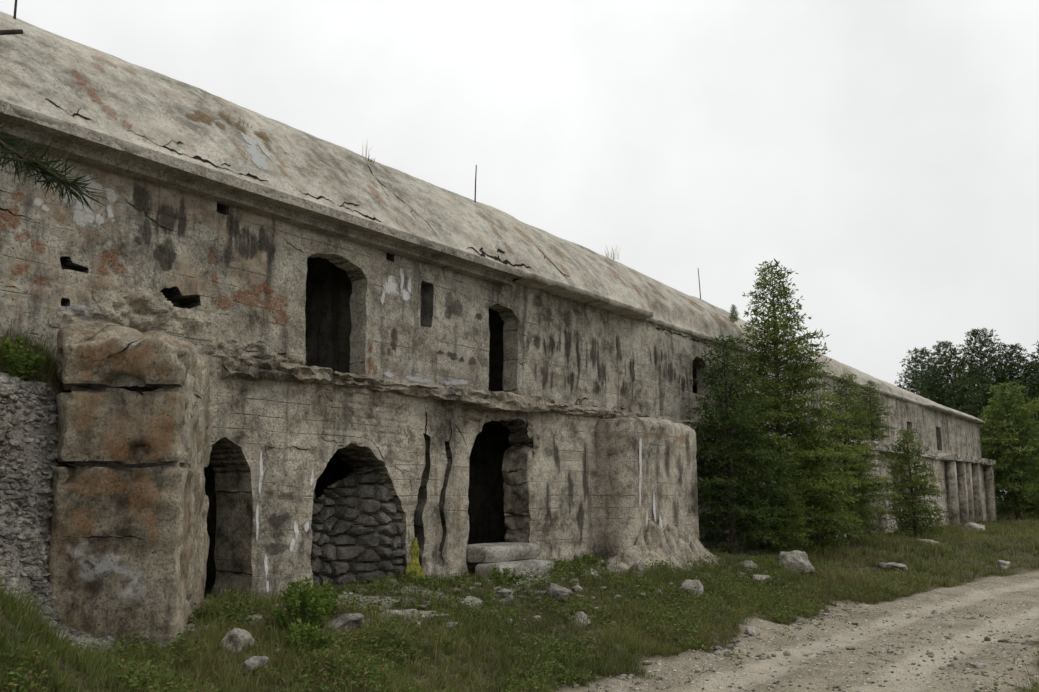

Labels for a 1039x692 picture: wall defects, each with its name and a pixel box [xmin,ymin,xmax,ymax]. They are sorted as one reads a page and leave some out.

crack [45,98,94,122]
crack [127,130,267,181]
leakage [225,215,275,266]
spalling [58,282,306,366]
rust [215,283,291,325]
spalling [384,371,469,385]
leakage [527,331,609,396]
leakage [616,337,635,398]
leakage [650,347,688,395]
peeling [321,387,414,473]
crack [408,412,467,569]